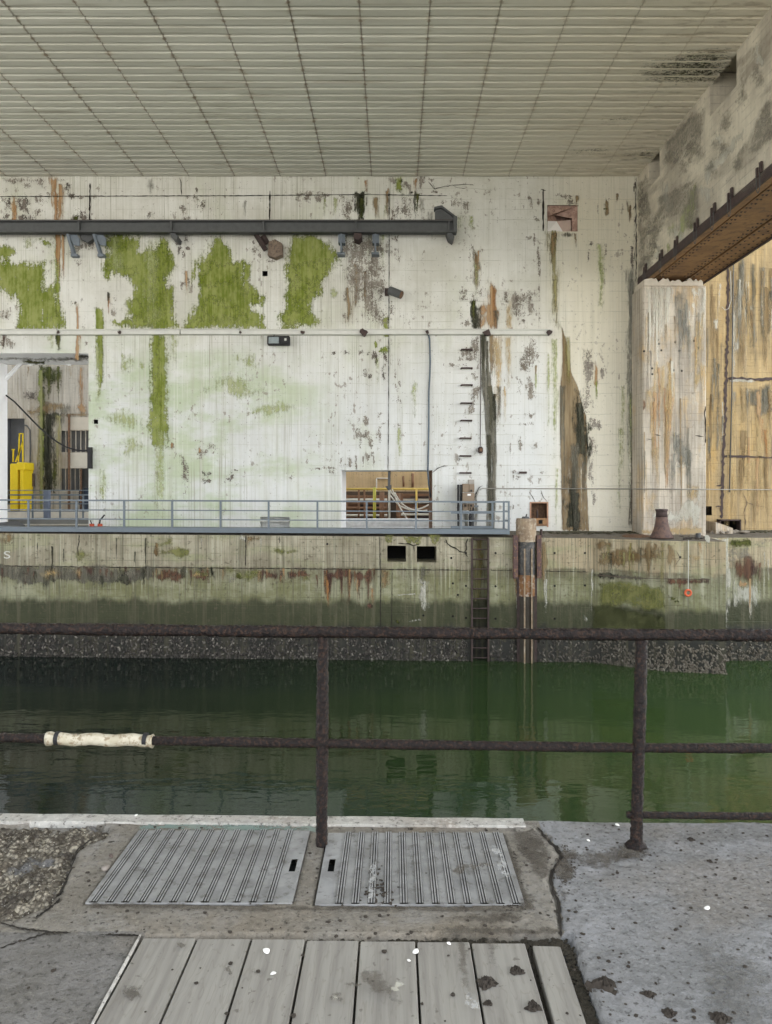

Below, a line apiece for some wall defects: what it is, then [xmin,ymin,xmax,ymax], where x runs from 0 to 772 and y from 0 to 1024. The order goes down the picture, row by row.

damp [644,48,730,86]
corrosion [51,178,64,220]
corrosion [55,235,65,275]
corrosion [473,251,511,396]
damp [646,288,706,365]
damp [626,271,634,438]
damp [730,379,771,426]
corrosion [257,568,388,608]
corrosion [736,556,761,586]
crack [0,839,114,948]
crack [537,827,564,936]
crack [102,931,139,939]